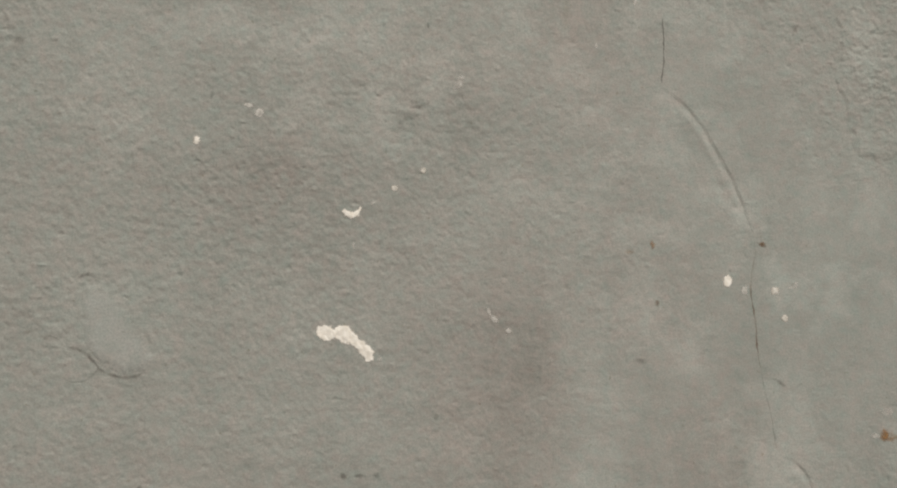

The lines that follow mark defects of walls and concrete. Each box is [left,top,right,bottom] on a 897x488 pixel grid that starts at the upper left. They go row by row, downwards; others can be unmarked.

spalling [342,207,362,219]
spalling [316,325,375,362]